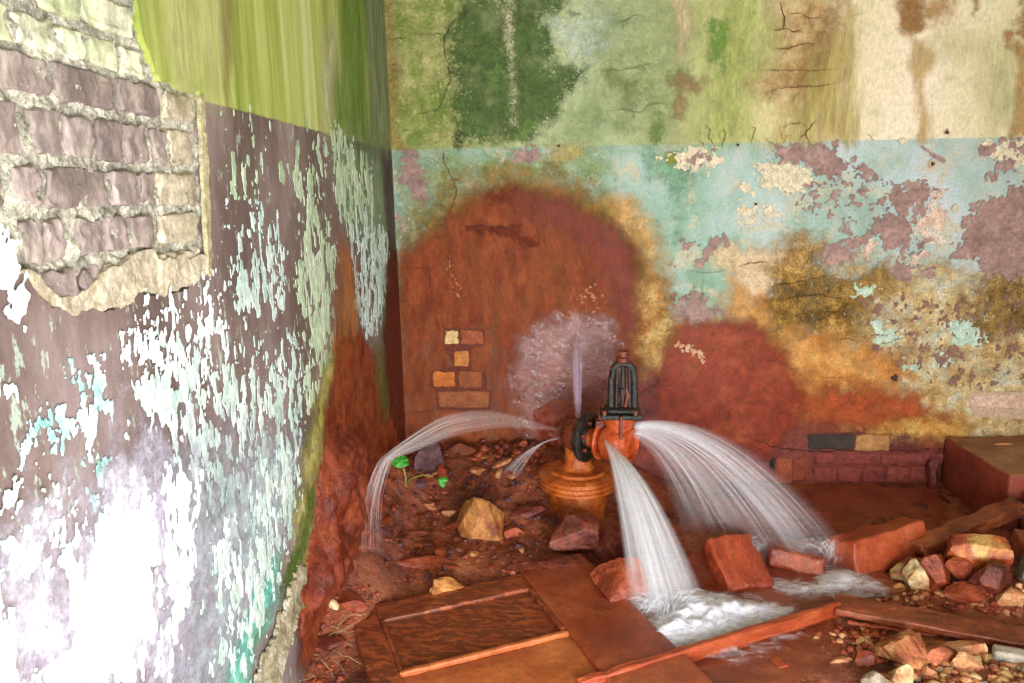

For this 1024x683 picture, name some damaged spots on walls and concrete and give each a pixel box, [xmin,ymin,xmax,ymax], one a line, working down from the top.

damp [502,0,517,125]
peeling [654,143,724,177]
crack [752,121,816,144]
crack [754,3,840,102]
damp [898,0,948,143]
spalling [0,0,408,683]
spalling [429,327,492,411]
damp [508,313,622,441]
corrosion [320,166,1024,484]
peeling [735,136,1024,419]
damp [74,431,212,683]
corrosion [297,618,322,671]